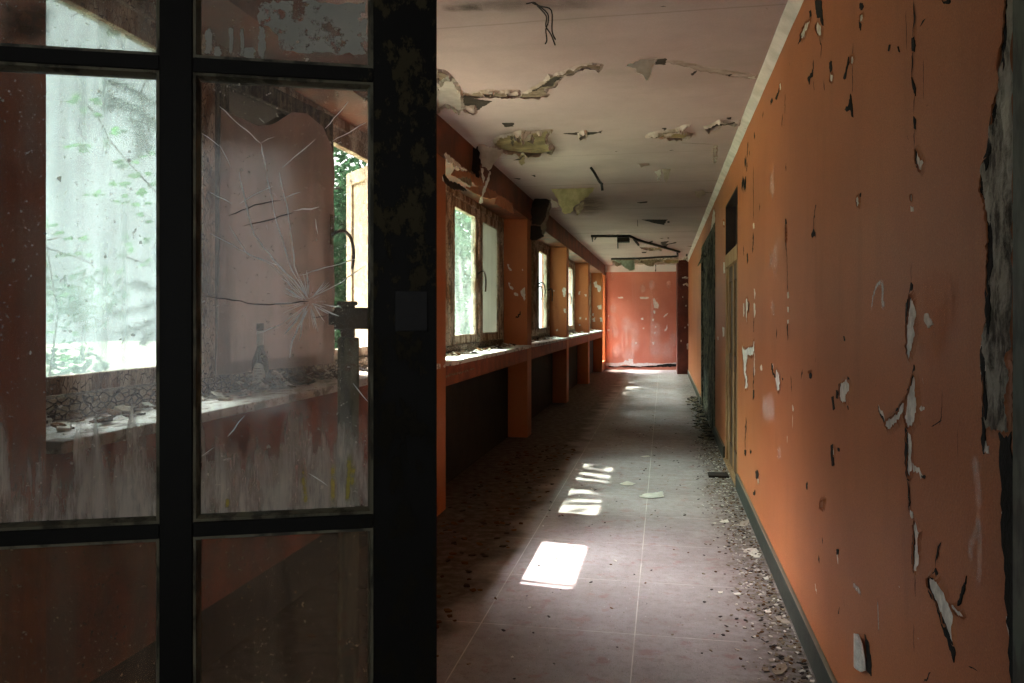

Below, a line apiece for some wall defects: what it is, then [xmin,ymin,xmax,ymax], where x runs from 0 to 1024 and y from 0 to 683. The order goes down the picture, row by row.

peeling [798,0,824,50]
peeling [437,62,604,115]
peeling [627,58,759,81]
peeling [824,51,856,118]
peeling [645,117,746,163]
peeling [442,123,602,214]
peeling [530,188,594,241]
peeling [742,289,783,399]
flaking render [978,0,1013,683]
peeling [878,282,967,663]
peeling [854,633,872,676]